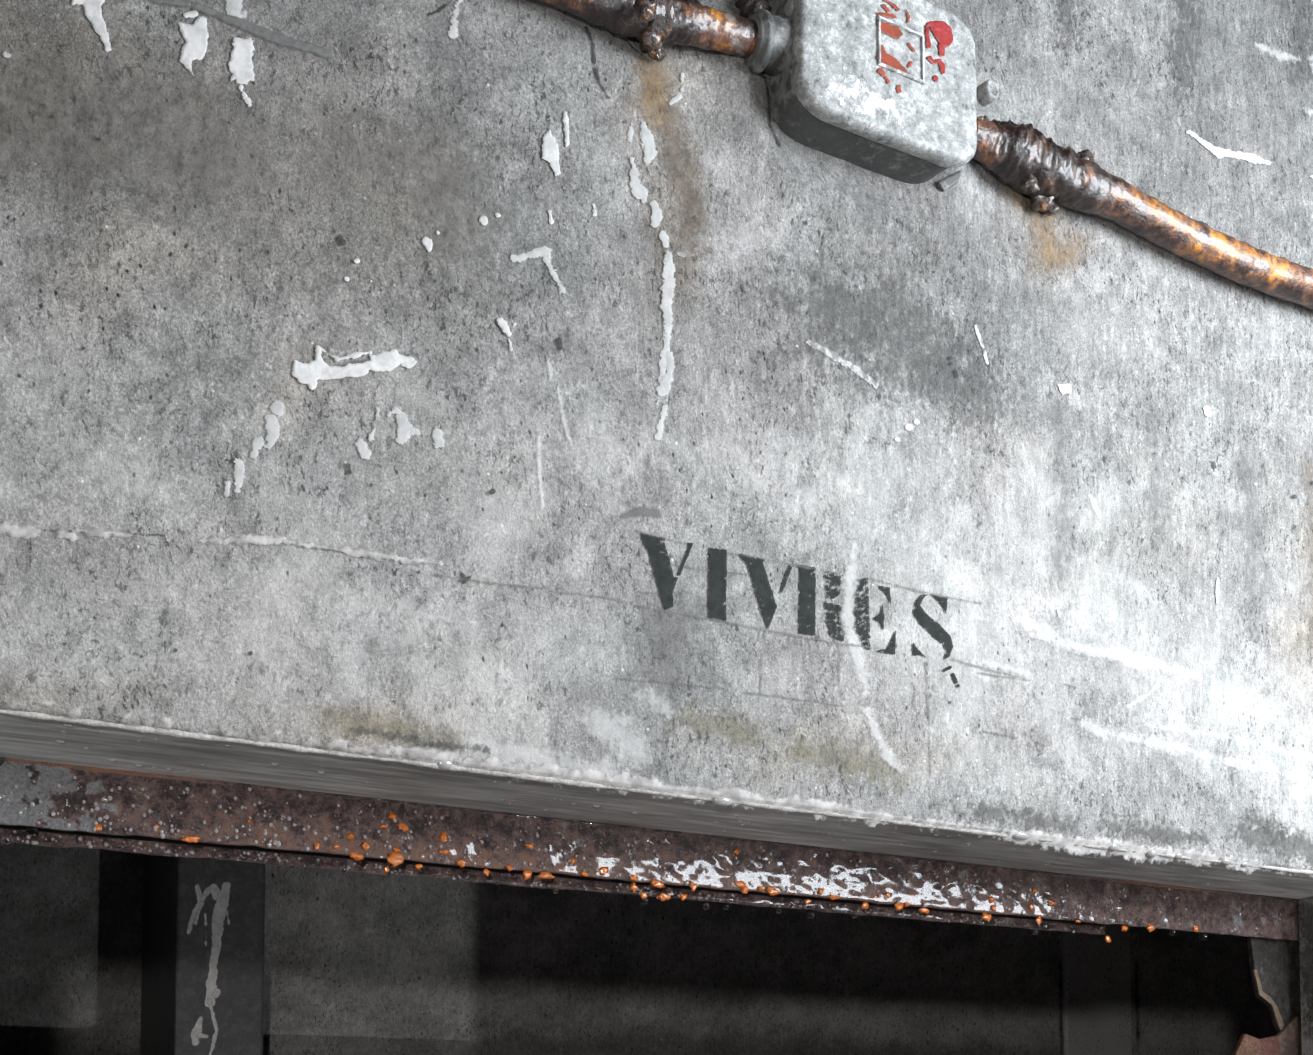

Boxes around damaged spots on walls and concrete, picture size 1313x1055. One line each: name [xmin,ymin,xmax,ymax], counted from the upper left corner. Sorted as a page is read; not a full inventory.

corrosion [381,811,409,832]
corrosion [314,832,370,861]
corrosion [383,847,422,872]
corrosion [439,832,466,868]
corrosion [506,865,555,880]
corrosion [570,857,609,877]
corrosion [628,875,698,901]
corrosion [734,881,780,896]
corrosion [804,888,841,904]
corrosion [861,892,929,914]
corrosion [982,896,996,921]
corrosion [1029,887,1057,925]